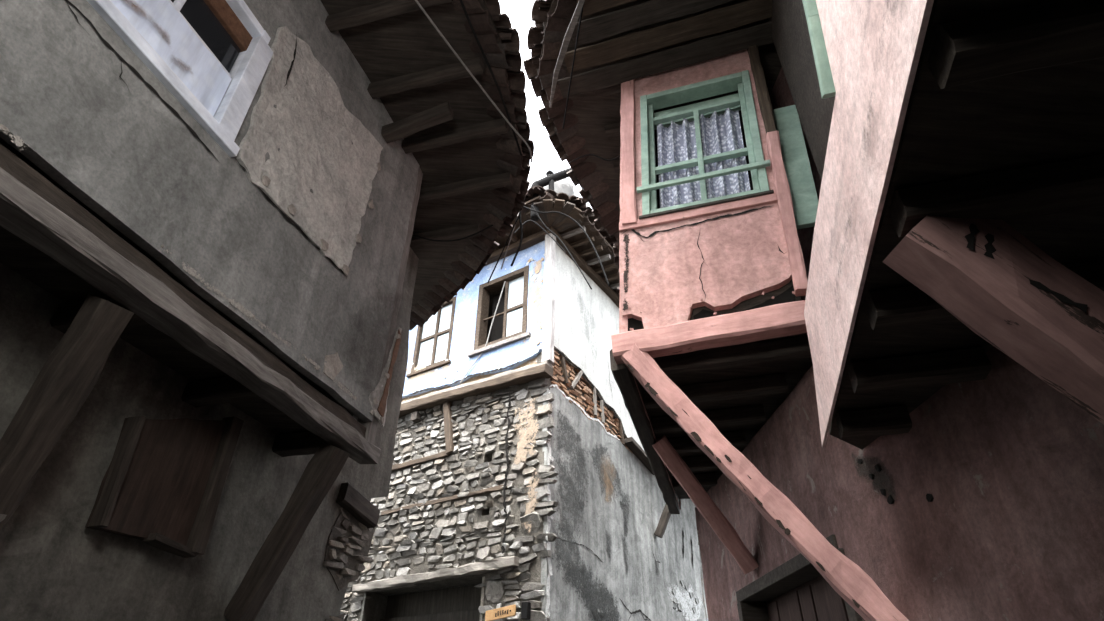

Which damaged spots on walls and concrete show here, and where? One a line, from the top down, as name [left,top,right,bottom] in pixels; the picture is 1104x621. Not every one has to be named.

flaking render [182,261,402,427]
peeling [406,253,545,388]
crack [622,205,774,303]
flaking render [689,298,717,320]
flaking render [744,285,795,311]
flaking render [513,349,632,465]
flaking render [323,508,375,591]
spalling [522,472,553,621]
damp [552,411,631,621]